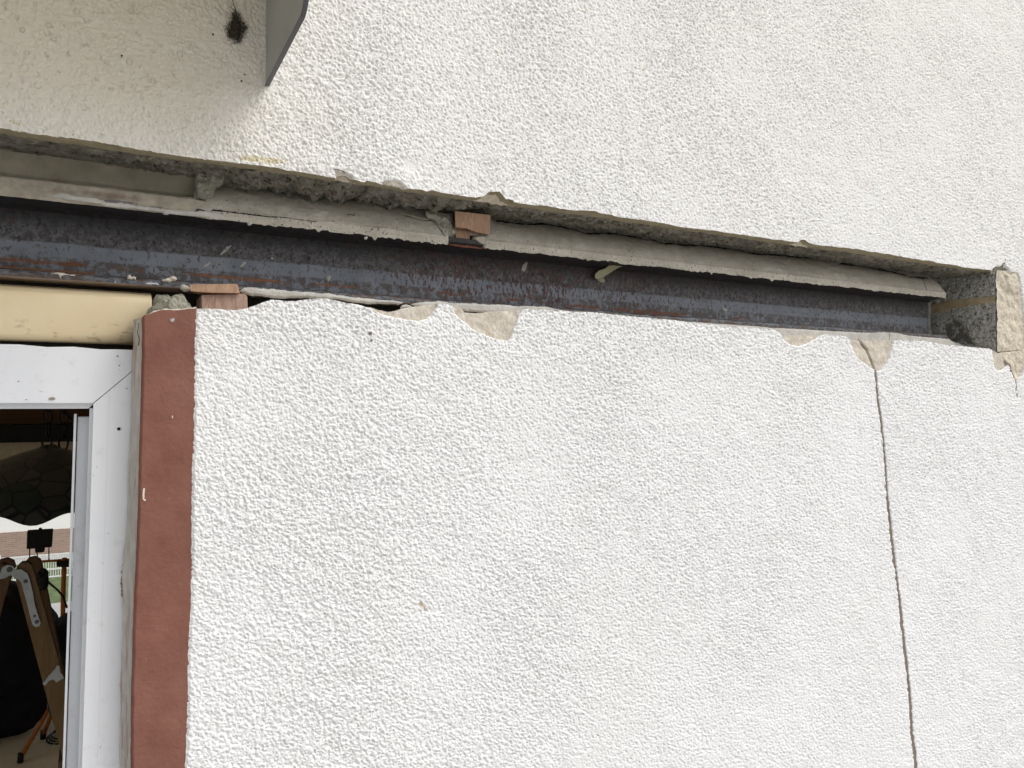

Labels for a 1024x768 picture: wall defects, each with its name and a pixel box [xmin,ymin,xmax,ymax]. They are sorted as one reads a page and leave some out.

rust [0,257,94,274]
spalling [366,304,436,322]
spalling [453,306,521,341]
rust [614,308,686,316]
spalling [989,264,1024,381]
spalling [850,340,892,371]
crack [858,339,917,768]